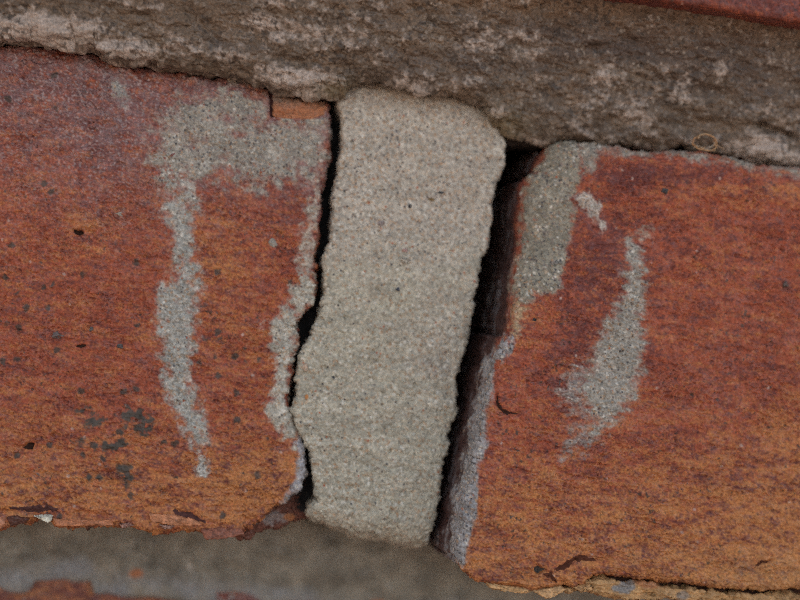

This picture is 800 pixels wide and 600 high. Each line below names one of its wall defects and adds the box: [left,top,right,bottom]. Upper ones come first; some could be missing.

crack [504,138,545,165]
crack [290,100,340,407]
crack [496,396,518,415]
crack [294,449,313,512]
spalling [486,574,800,600]